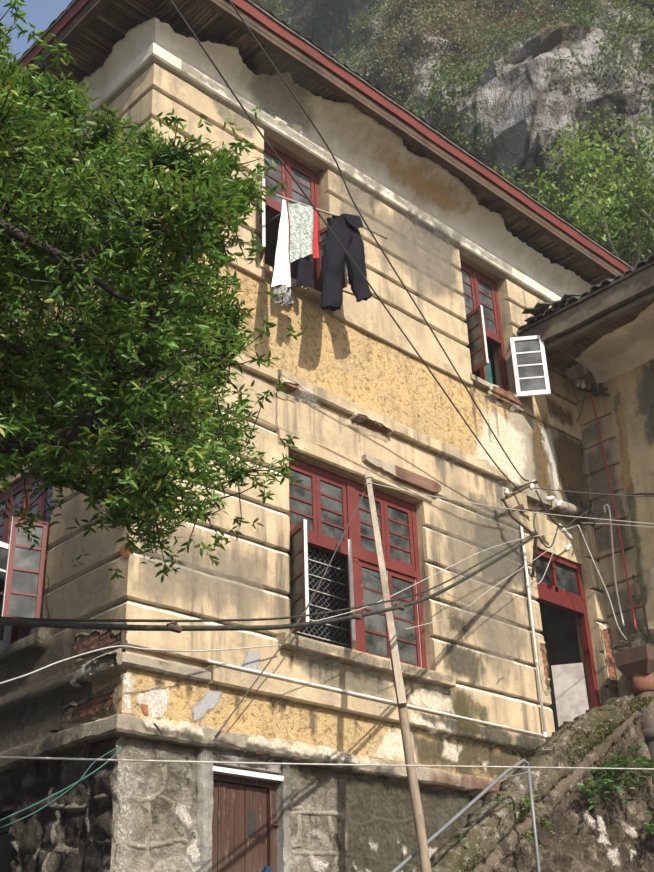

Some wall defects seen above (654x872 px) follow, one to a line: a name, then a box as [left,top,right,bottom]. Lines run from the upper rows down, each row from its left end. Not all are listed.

leakage [637,359,654,443]
leakage [290,390,630,761]
flaking render [48,622,168,733]